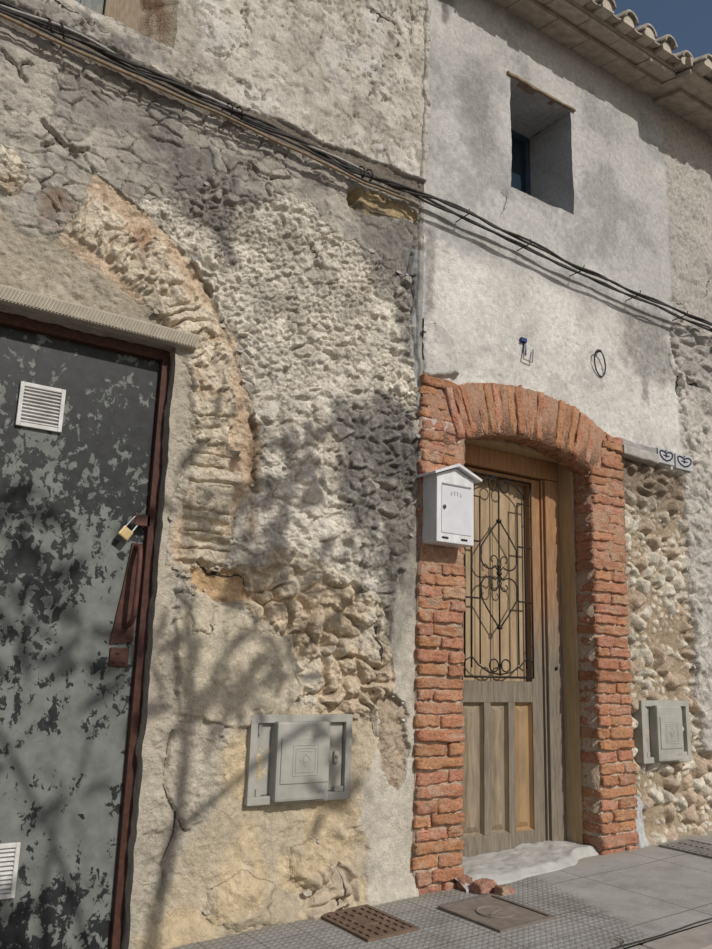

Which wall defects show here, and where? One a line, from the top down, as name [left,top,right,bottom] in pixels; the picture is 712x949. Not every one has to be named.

spalling [0,144,37,196]
spalling [621,456,712,845]
crack [160,734,184,886]